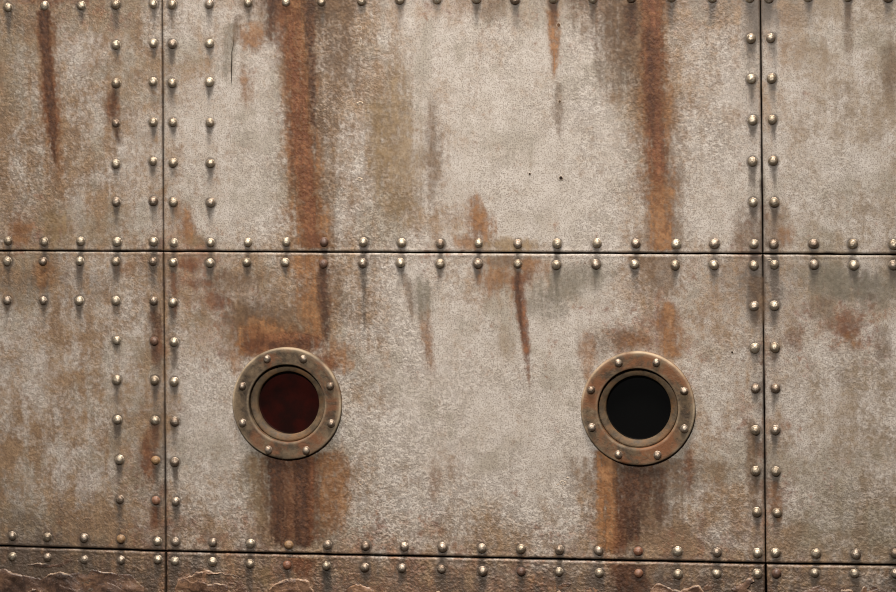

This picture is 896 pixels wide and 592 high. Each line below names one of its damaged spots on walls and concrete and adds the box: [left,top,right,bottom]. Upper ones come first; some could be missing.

corrosion [37,10,61,164]
corrosion [229,0,351,373]
corrosion [457,195,529,251]
corrosion [596,0,681,357]
corrosion [479,260,539,370]
corrosion [261,453,346,547]
corrosion [584,450,695,553]
corrosion [175,570,248,592]
corrosion [269,558,314,592]
corrosion [345,584,374,592]
corrosion [613,565,714,592]